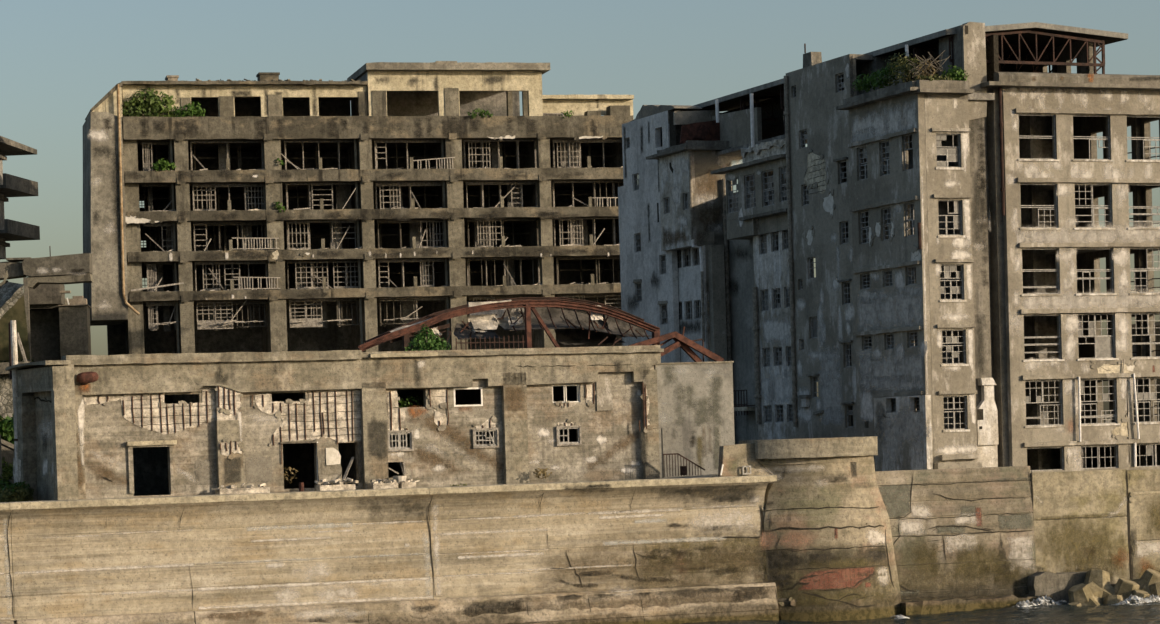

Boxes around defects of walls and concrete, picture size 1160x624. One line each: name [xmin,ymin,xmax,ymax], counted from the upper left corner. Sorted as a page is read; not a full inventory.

peeling [804,148,835,219]
spalling [78,386,362,465]
crack [722,363,1160,608]
leakage [1,564,194,574]
crack [547,534,591,612]
leakage [1130,532,1160,571]